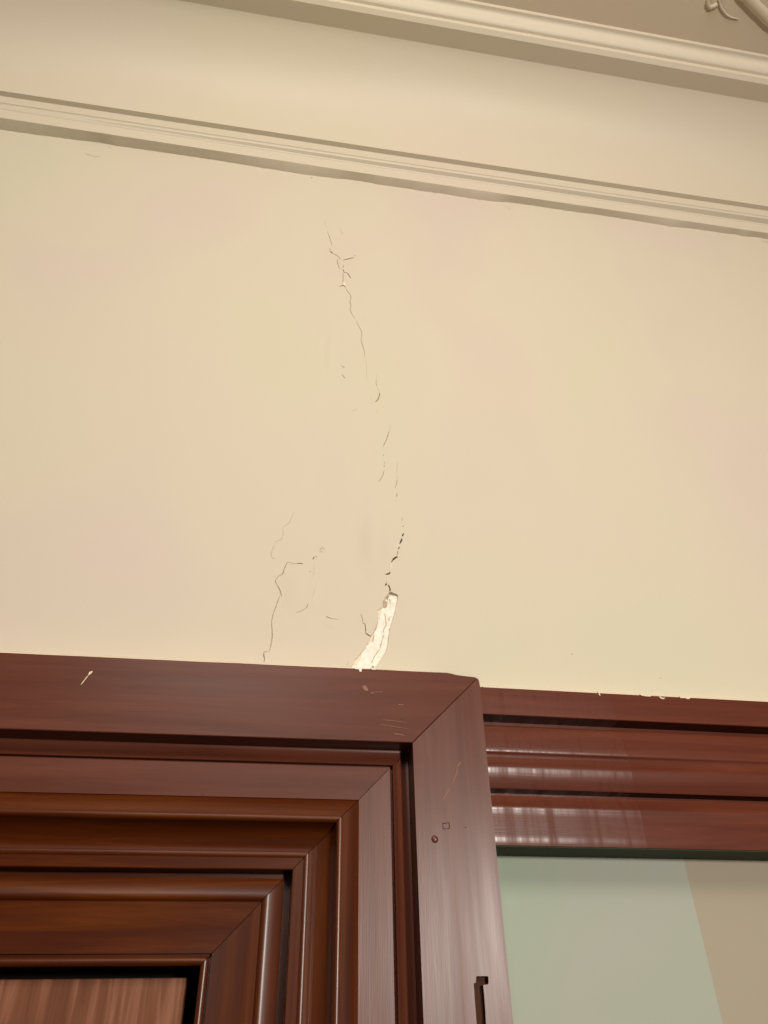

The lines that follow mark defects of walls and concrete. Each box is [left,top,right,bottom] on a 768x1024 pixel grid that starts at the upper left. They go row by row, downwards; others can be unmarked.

crack [325,222,382,404]
crack [378,426,404,592]
crack [263,513,303,663]
crack [361,614,371,637]
peeling [352,592,398,669]